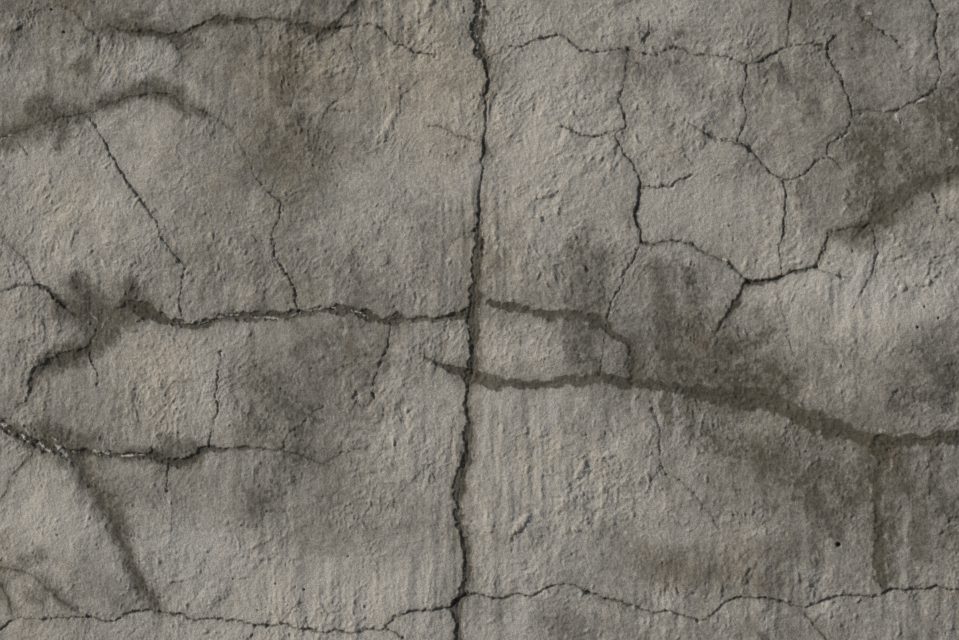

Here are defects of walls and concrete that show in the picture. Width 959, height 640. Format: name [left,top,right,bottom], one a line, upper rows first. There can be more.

crack [0,0,944,421]
water stain [826,36,959,257]
water stain [18,264,159,389]
water stain [0,411,209,621]
crack [0,350,959,640]
crack [459,82,959,591]
water stain [622,254,870,640]
water stain [884,340,959,417]
water stain [885,445,959,640]